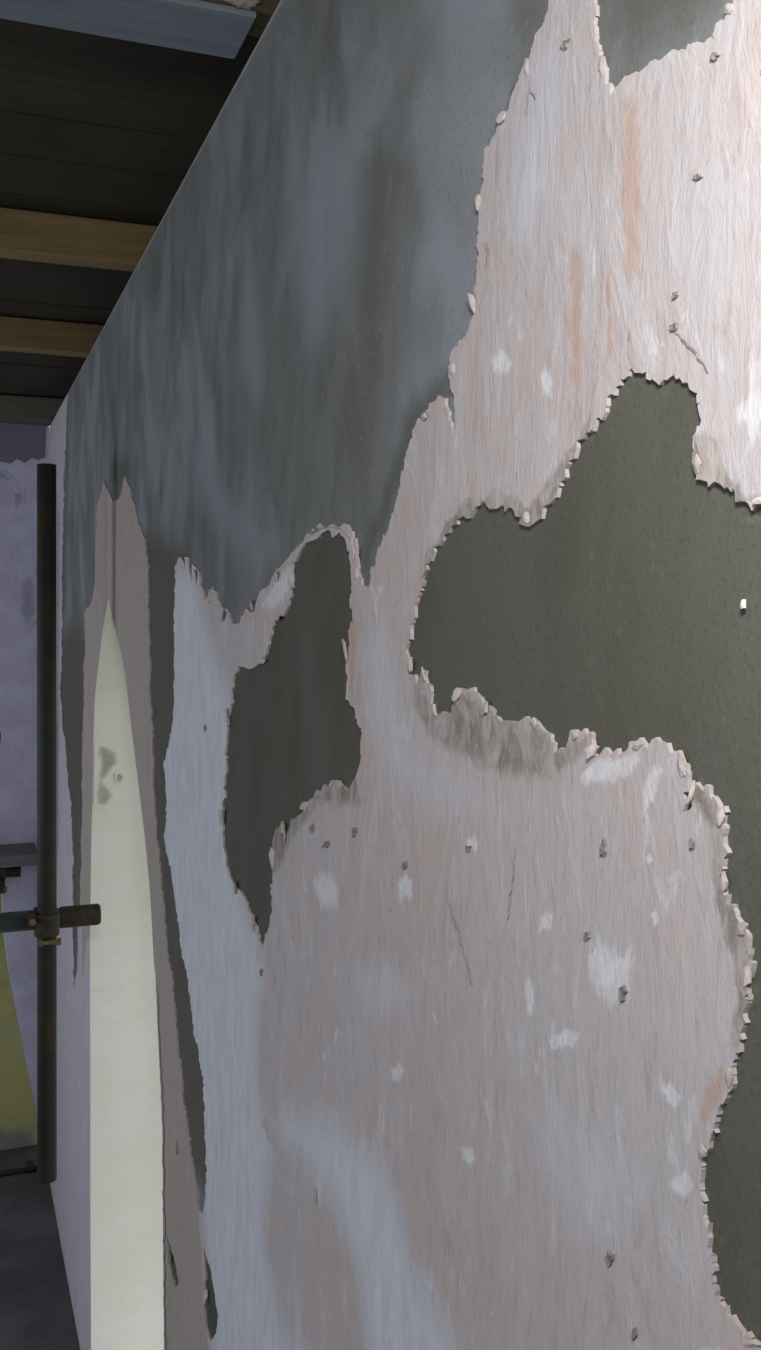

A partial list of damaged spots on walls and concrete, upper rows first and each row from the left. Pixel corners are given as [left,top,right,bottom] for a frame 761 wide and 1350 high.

peeling [598,55,606,76]
water stain [597,0,733,88]
water stain [106,429,134,501]
peeling [49,0,589,908]
water stain [138,0,549,1211]
peeling [163,371,761,1350]
peeling [51,926,91,1350]
spalling [156,983,179,1350]